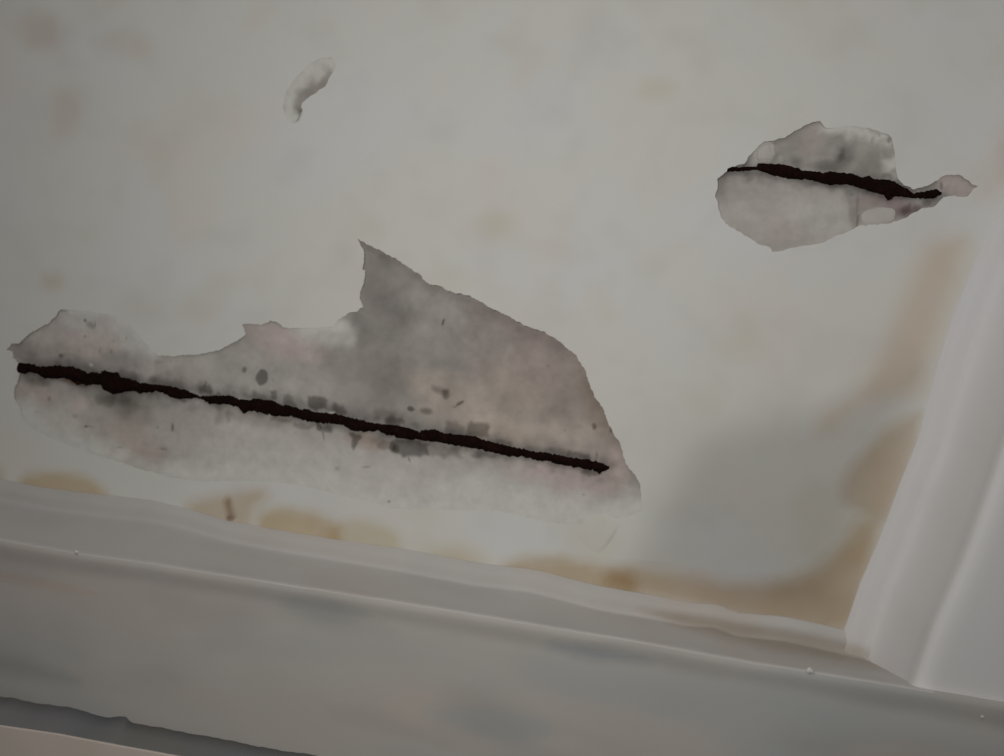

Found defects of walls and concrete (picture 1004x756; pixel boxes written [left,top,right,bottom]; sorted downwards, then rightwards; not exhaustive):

flaking render [282,57,336,124]
spalling [715,121,977,252]
spalling [6,239,642,524]